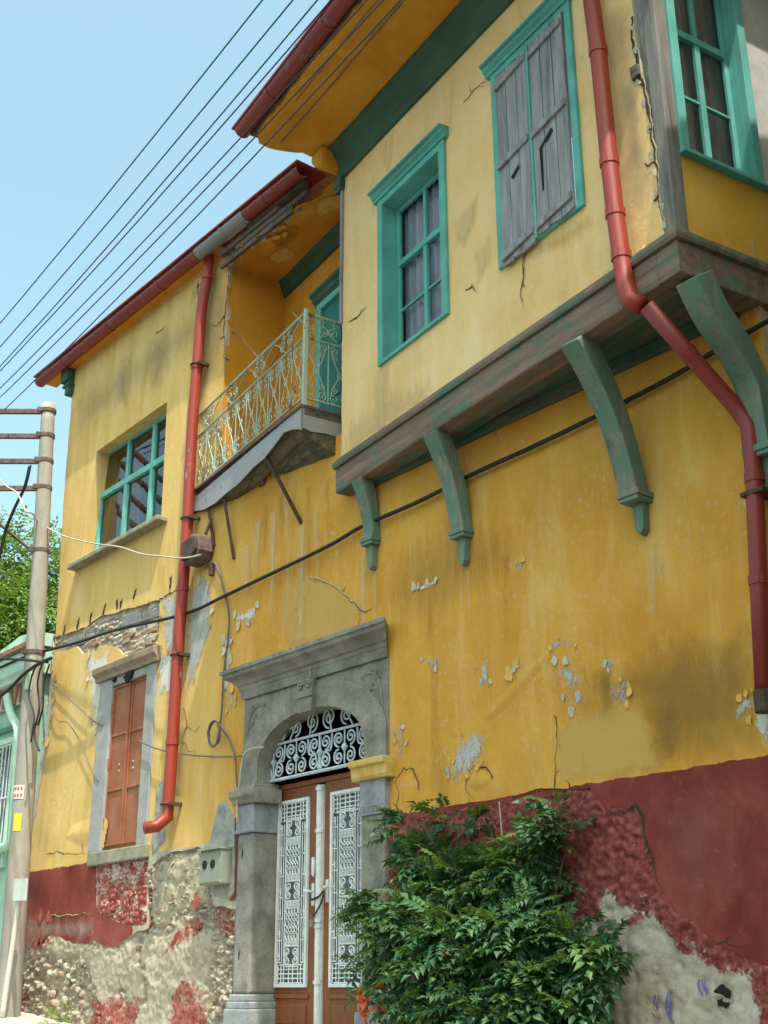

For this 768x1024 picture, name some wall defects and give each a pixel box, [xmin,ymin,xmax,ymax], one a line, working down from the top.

crack [630,14,666,223]
crack [216,273,230,379]
crack [519,253,527,303]
flaking render [33,596,176,819]
peeling [187,574,214,690]
crack [290,569,374,651]
peeling [411,577,438,592]
peeling [446,732,484,783]
crack [512,715,587,799]
peeling [548,636,584,717]
flaking render [21,847,236,1024]
flaking render [393,788,768,1024]